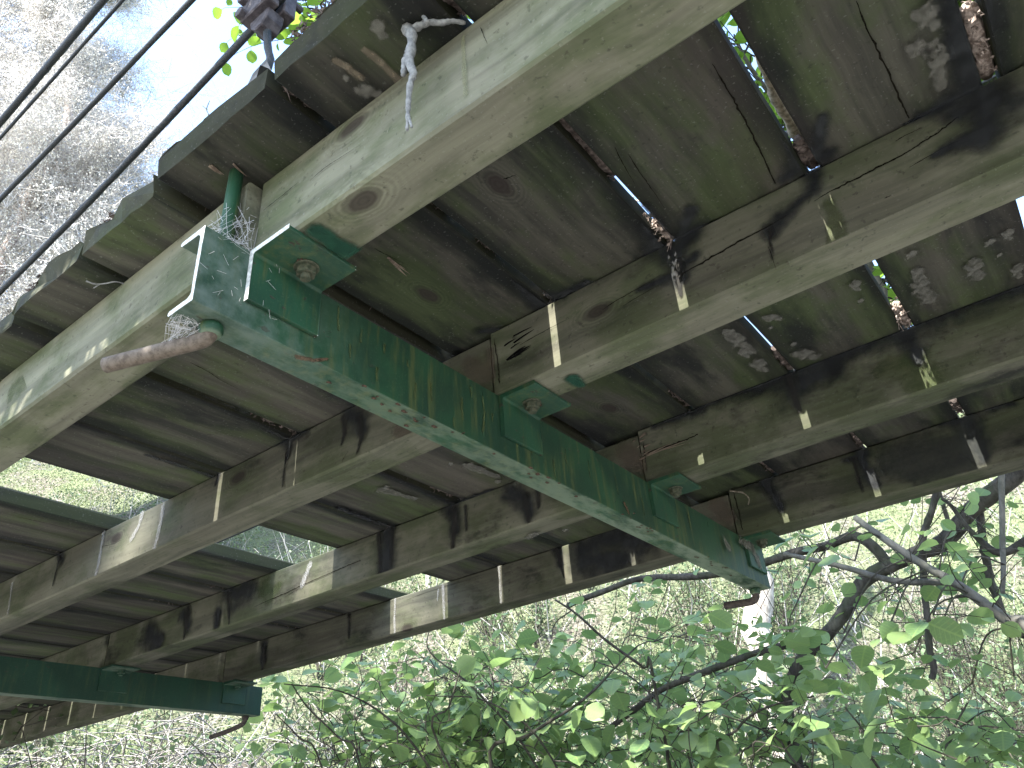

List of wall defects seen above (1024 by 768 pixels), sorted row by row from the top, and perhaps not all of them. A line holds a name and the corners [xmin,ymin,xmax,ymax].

crack [712,64,776,184]
damp [761,113,837,259]
crack [815,1,953,201]
damp [903,0,1024,159]
damp [323,390,367,454]
damp [651,284,1024,429]
damp [425,485,540,549]